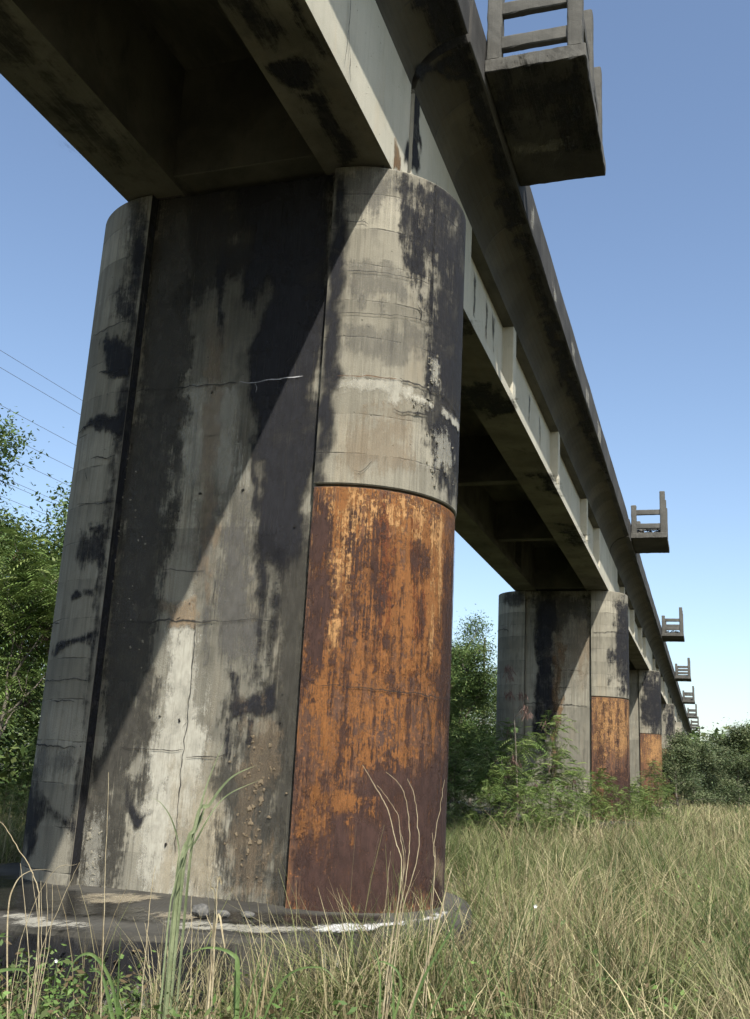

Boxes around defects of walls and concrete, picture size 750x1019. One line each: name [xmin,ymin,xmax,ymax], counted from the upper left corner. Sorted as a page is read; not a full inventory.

crack [137,376,301,403]
water stain [396,94,517,511]
water stain [411,0,610,483]
water stain [0,57,412,932]
water stain [526,473,561,496]
corrosion [285,487,455,913]
water stain [504,591,591,780]
corrosion [591,697,631,821]
corrosion [641,735,662,769]
water stain [0,930,448,1019]